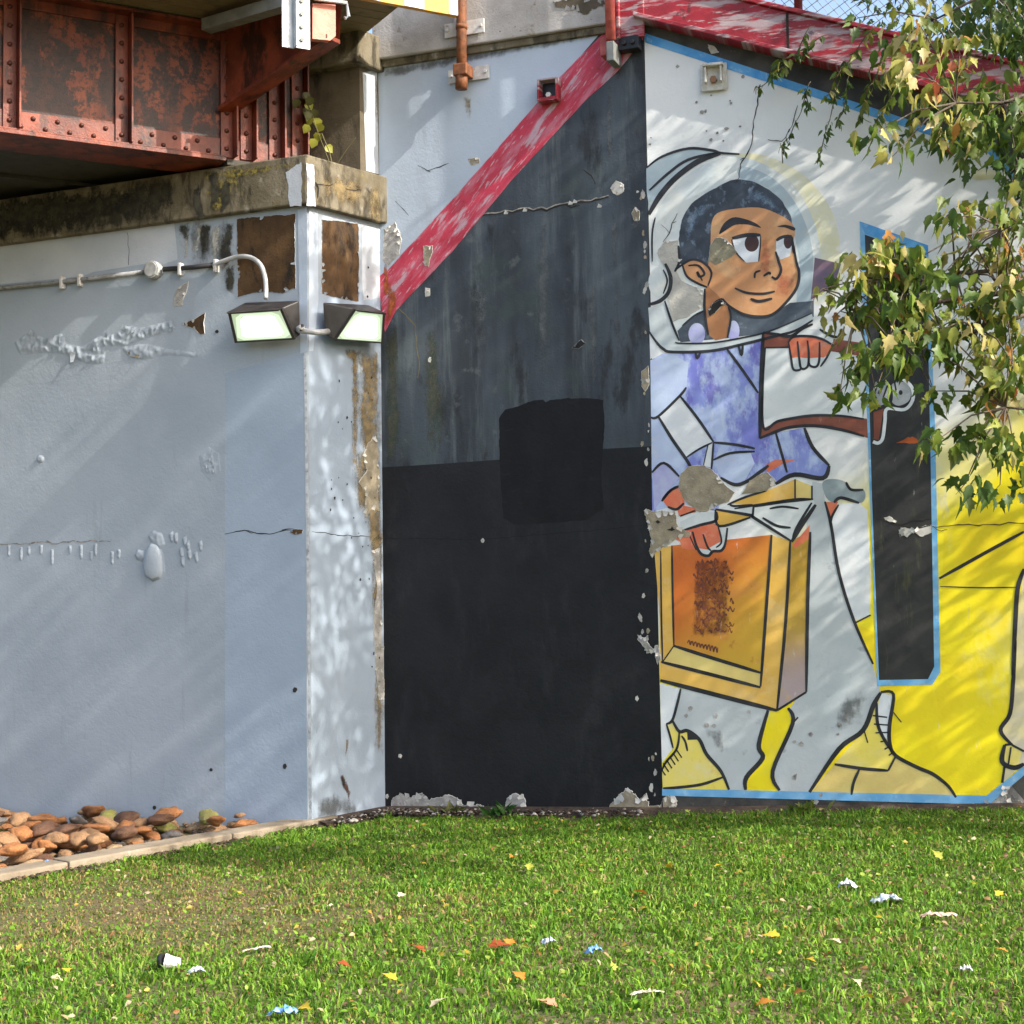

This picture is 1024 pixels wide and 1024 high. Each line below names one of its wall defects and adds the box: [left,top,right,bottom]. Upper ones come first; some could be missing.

leakage [0,180,174,239]
leakage [180,164,290,291]
peeling [236,213,296,297]
peeling [321,219,369,302]
leakage [325,178,380,218]
crack [483,170,609,216]
peeling [610,181,726,322]
crack [0,540,121,565]
crack [226,528,383,539]
spalling [644,509,690,573]
spalling [884,516,931,537]
peeling [385,792,482,806]